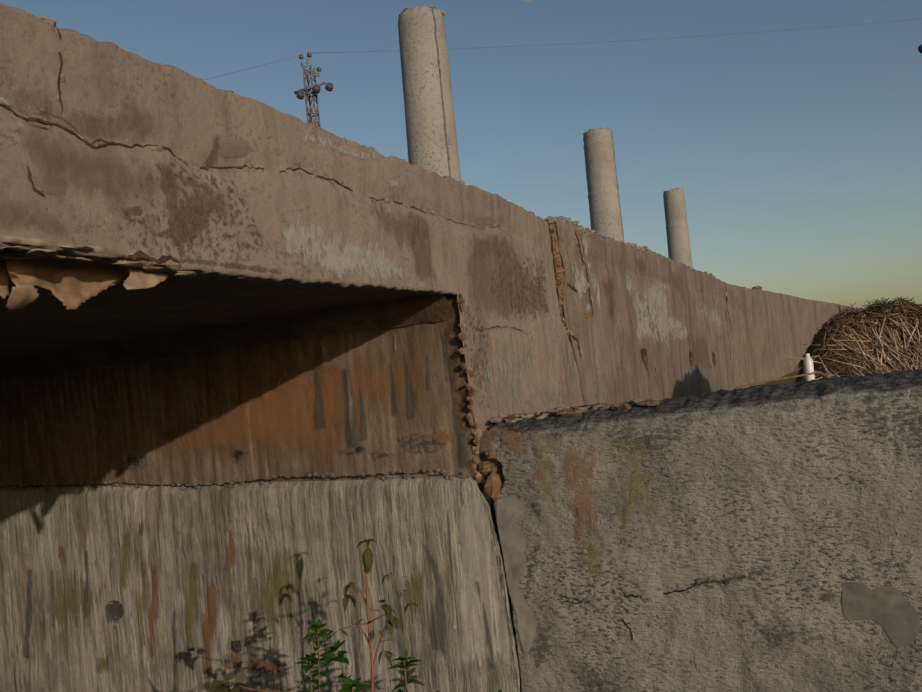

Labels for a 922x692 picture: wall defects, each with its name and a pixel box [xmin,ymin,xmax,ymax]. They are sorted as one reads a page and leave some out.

spalling [442,294,666,486]
crack [545,220,594,405]
damp [842,583,920,648]